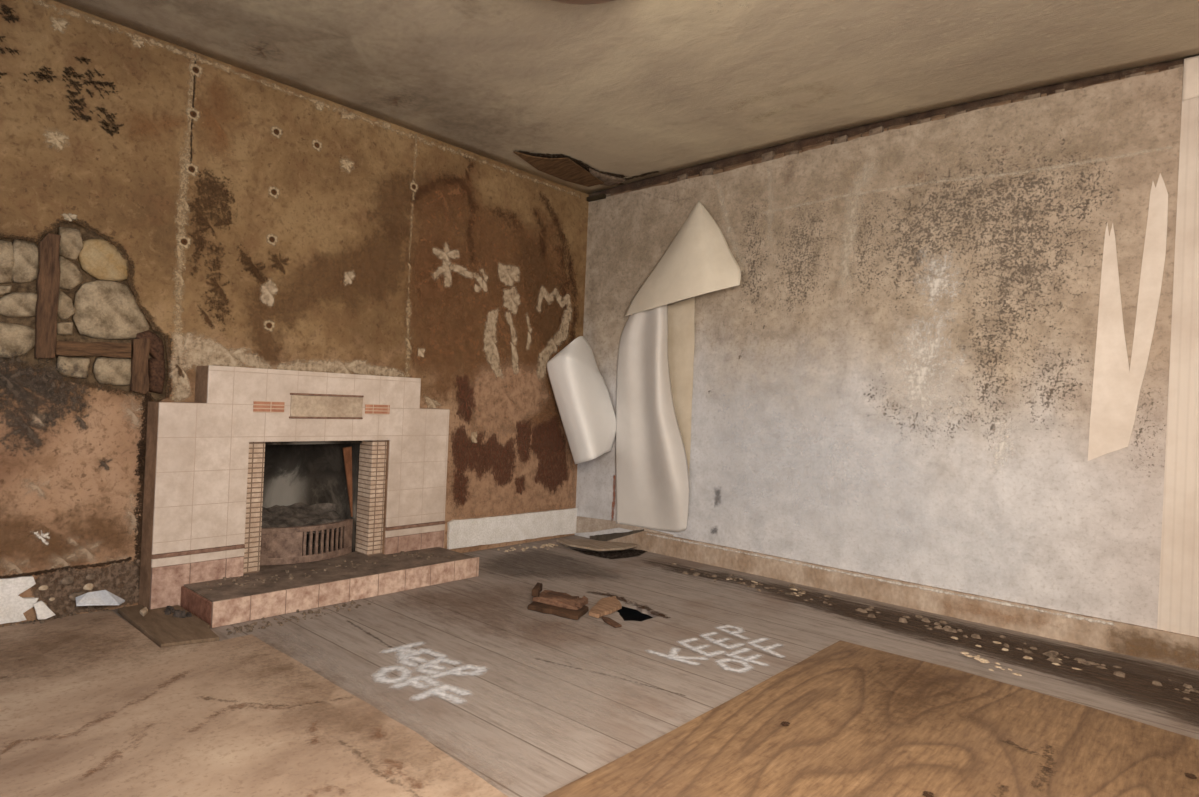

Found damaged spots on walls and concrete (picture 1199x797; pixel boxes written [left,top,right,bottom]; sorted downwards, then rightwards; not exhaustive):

flaking render [33,0,580,198]
spalling [0,213,404,425]
water stain [188,169,235,331]
water stain [237,159,577,518]
water stain [735,129,1113,437]
water stain [644,561,1199,727]